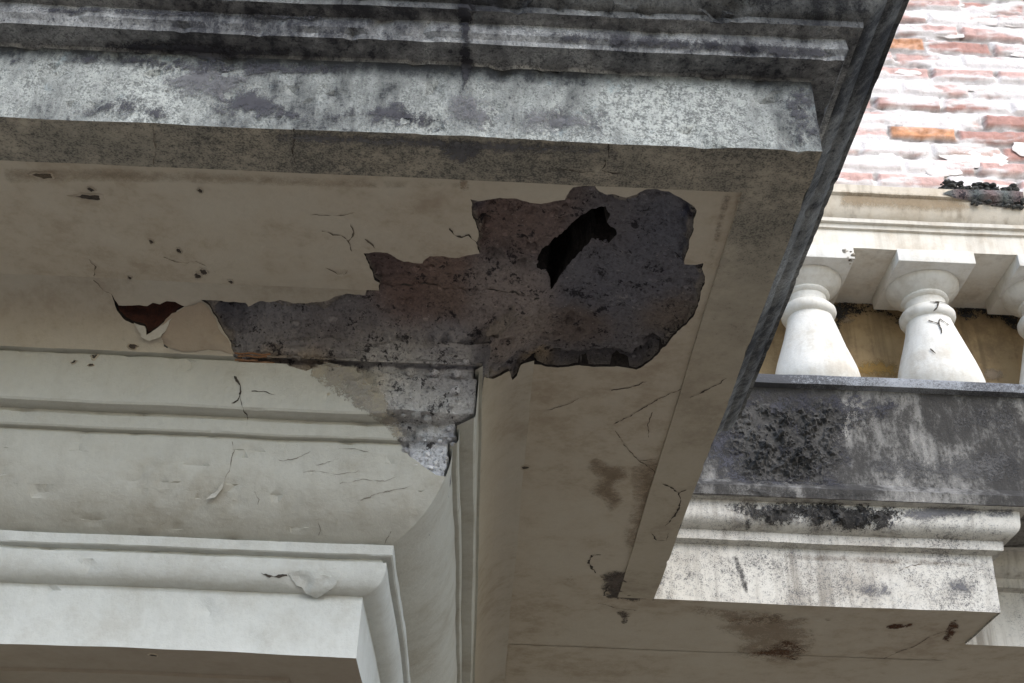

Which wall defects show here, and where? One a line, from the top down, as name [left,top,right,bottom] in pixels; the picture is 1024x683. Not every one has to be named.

peeling [926,142,1024,176]
crack [314,212,374,275]
spalling [111,294,184,350]
spalling [202,186,705,485]
crack [928,301,949,353]
crack [233,376,274,420]
crack [207,442,235,499]
crack [280,448,407,500]
crack [611,380,723,541]
water stain [708,390,1019,533]
peeling [263,570,337,598]
water stain [587,555,642,624]